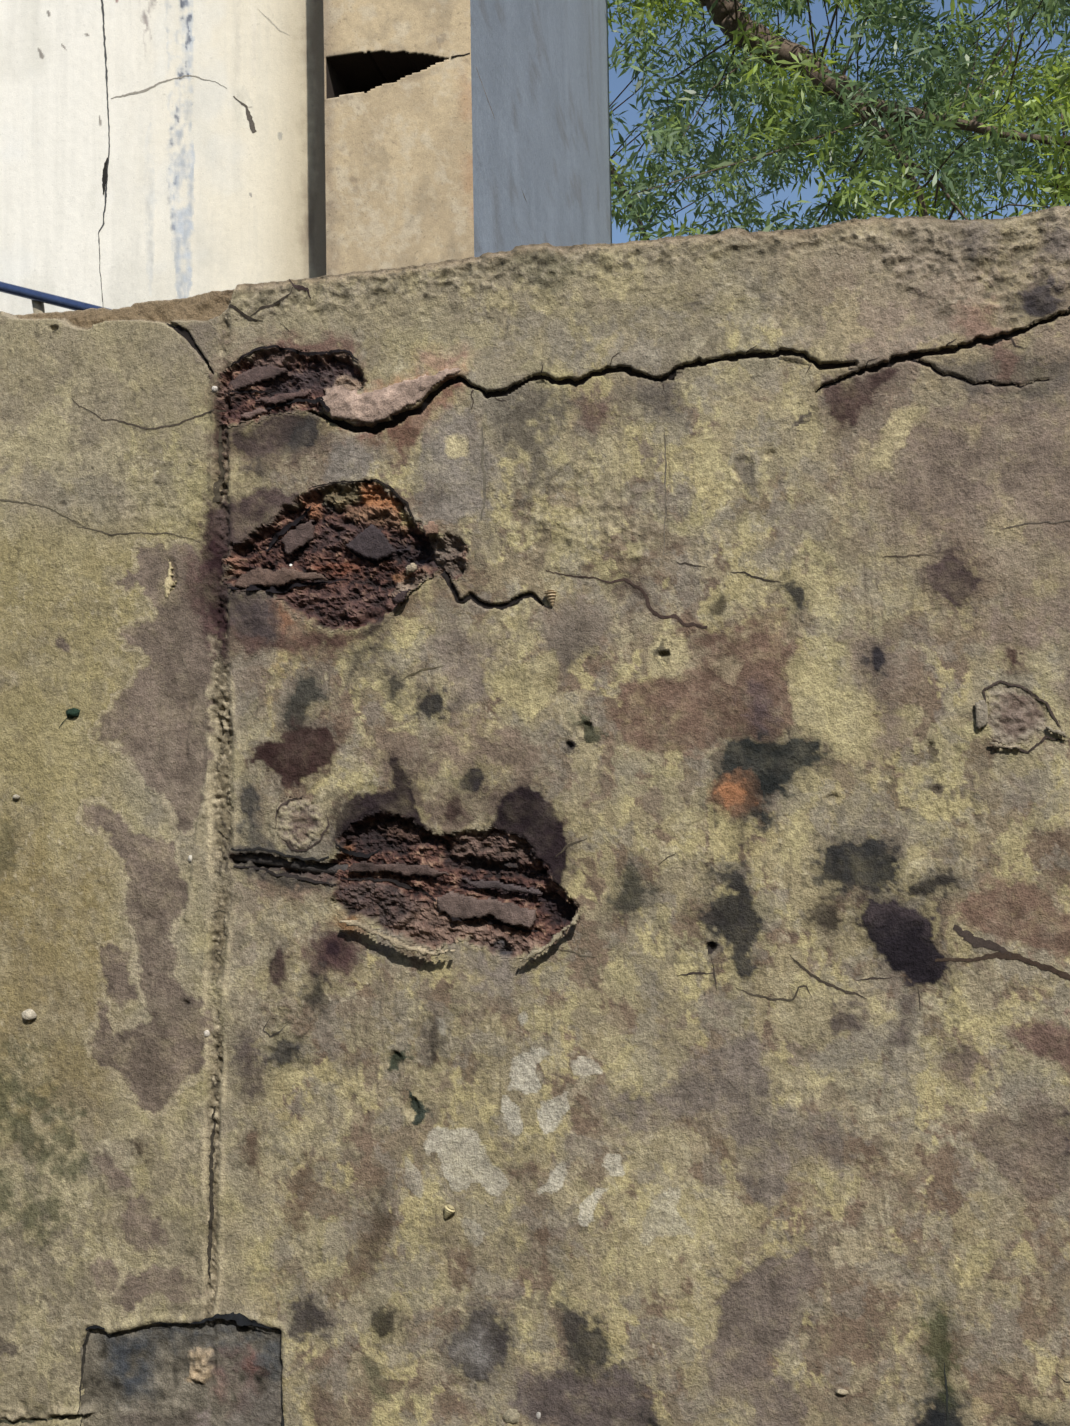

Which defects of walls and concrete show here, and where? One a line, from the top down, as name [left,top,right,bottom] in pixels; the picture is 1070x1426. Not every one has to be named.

crack [98,0,256,302]
rust [164,319,487,679]
spalling [213,344,461,428]
spalling [221,478,469,634]
crack [441,570,708,628]
crack [311,306,1070,520]
damp [75,532,331,1319]
rust [234,705,349,798]
spalling [228,795,583,964]
rust [320,740,580,900]
damp [274,560,932,1008]
damp [795,820,1070,1216]